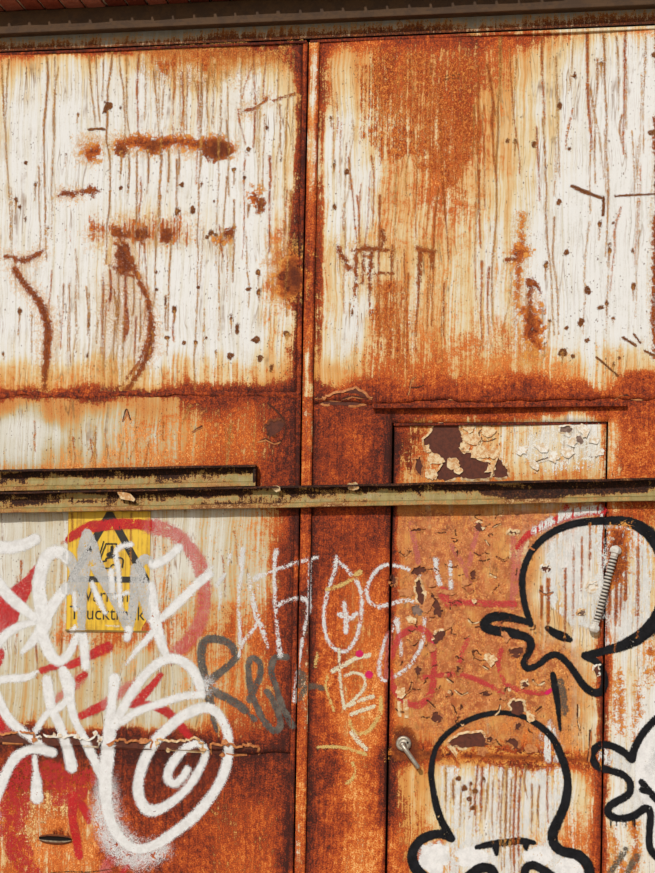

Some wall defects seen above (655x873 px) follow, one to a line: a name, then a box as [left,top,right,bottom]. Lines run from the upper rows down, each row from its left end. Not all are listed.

corrosion [0,39,317,401]
corrosion [325,30,655,373]
corrosion [68,412,150,468]
spalling [401,422,510,482]
peeling [512,423,604,476]
peeling [388,563,479,652]
spalling [412,664,424,680]
spalling [483,631,526,667]
spalling [430,709,445,723]
corrosion [607,819,646,873]